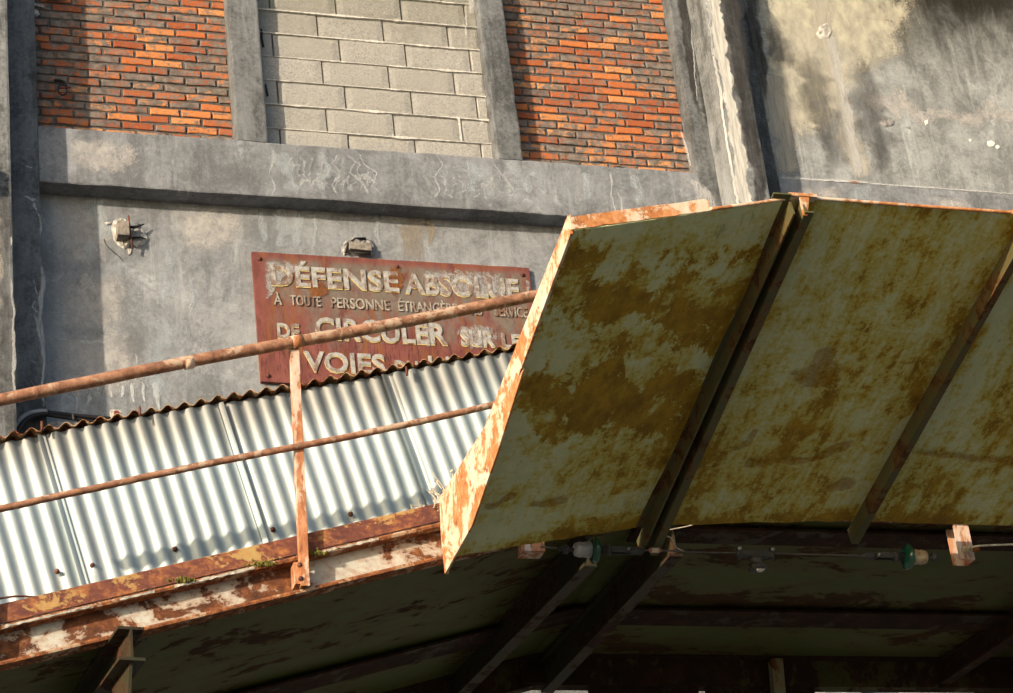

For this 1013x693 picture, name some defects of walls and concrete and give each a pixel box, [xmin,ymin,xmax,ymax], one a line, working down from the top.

water stain [678,0,707,120]
water stain [706,0,798,204]
water stain [808,0,868,176]
spalling [104,218,148,255]